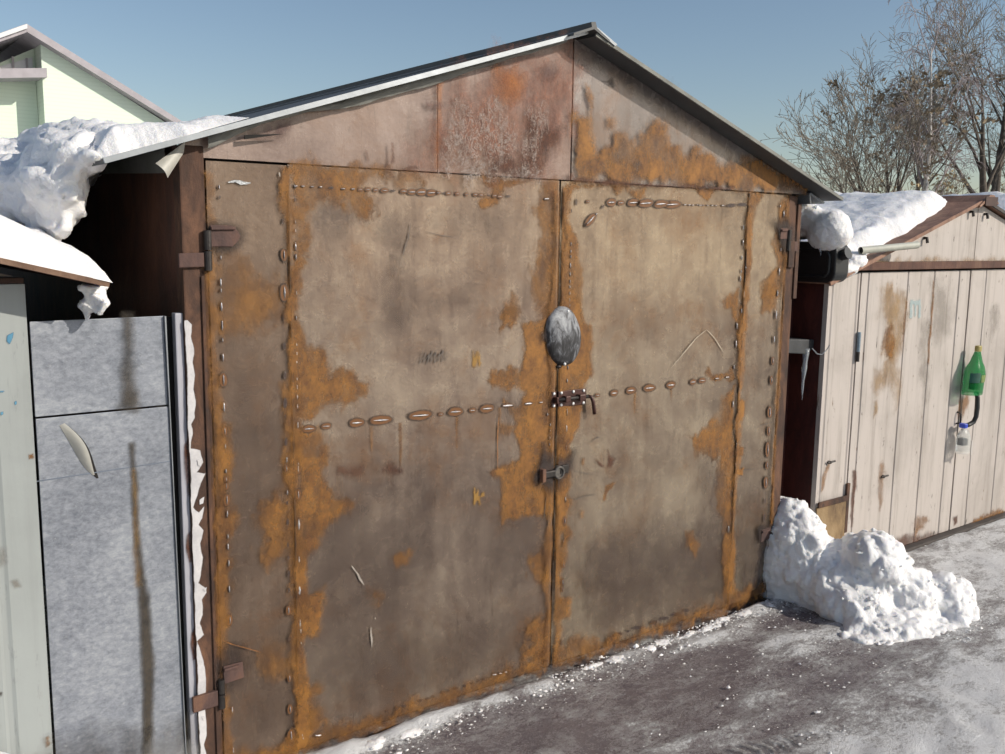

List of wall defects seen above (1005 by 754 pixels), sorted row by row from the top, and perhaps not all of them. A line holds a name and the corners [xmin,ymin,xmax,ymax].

leakage [130,444,154,754]
rust [206,250,237,659]
rust [259,86,808,754]
rust [883,287,907,360]